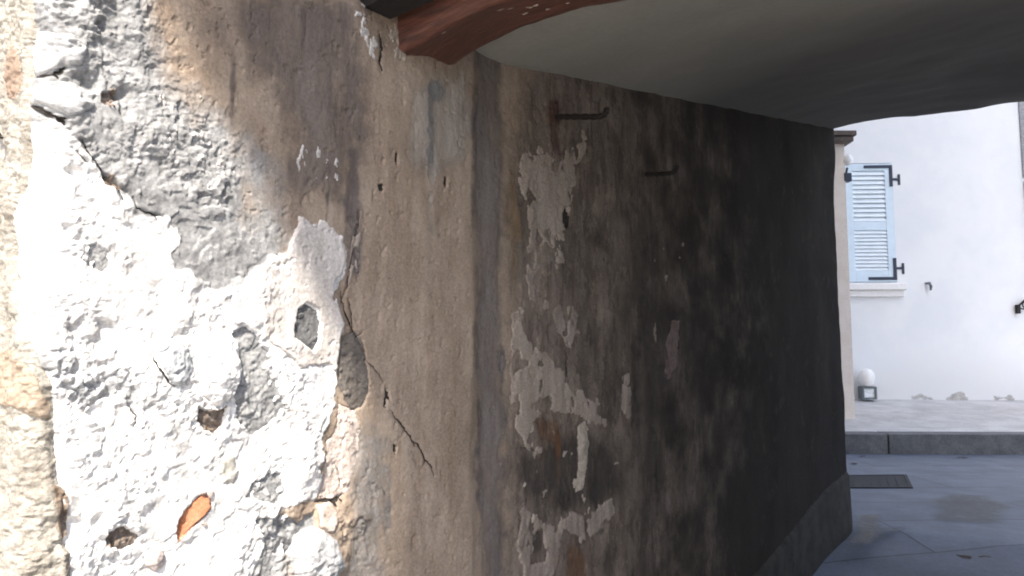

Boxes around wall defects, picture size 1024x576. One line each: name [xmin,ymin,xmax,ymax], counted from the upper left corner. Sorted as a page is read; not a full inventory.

peeling [354,3,406,61]
spalling [101,88,116,107]
spalling [101,173,123,191]
spalling [82,244,109,272]
crack [340,211,384,382]
spalling [53,349,140,413]
peeling [196,216,369,554]
peeling [509,129,615,576]
crack [390,410,434,475]
peeling [52,485,69,539]
spalling [105,526,138,549]
flaking render [176,489,214,542]